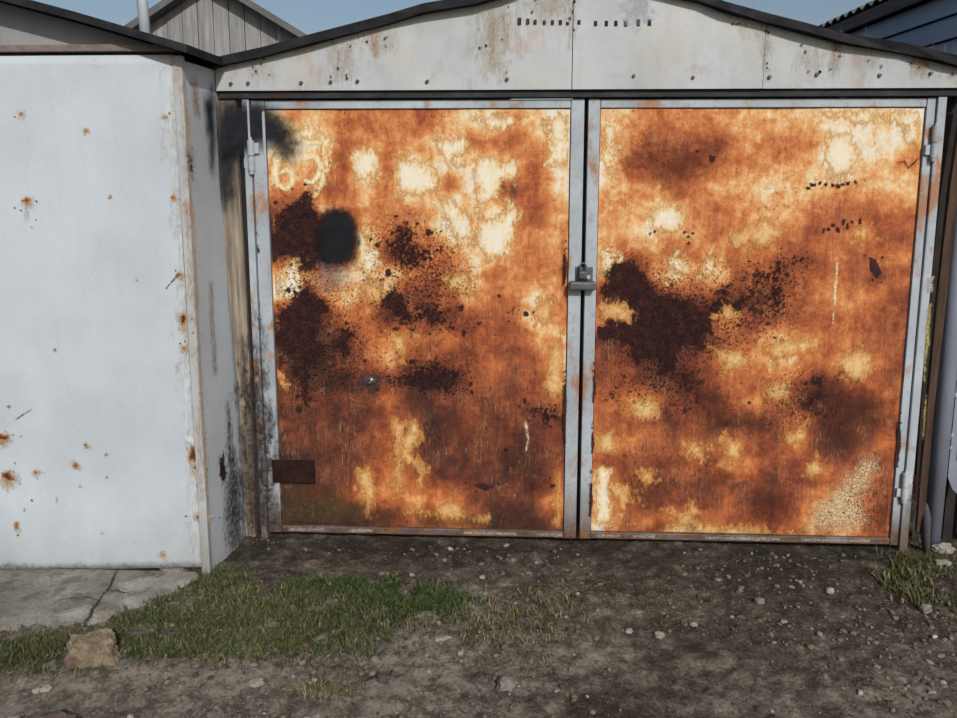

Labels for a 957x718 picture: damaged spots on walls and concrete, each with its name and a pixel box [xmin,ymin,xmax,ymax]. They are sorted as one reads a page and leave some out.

rust [272,184,329,274]
rust [370,215,481,337]
rust [865,255,884,283]
rust [276,285,357,413]
rust [597,248,808,423]
rust [376,357,473,399]
rust [519,398,564,428]
rust [801,377,829,419]
crack [53,568,131,622]